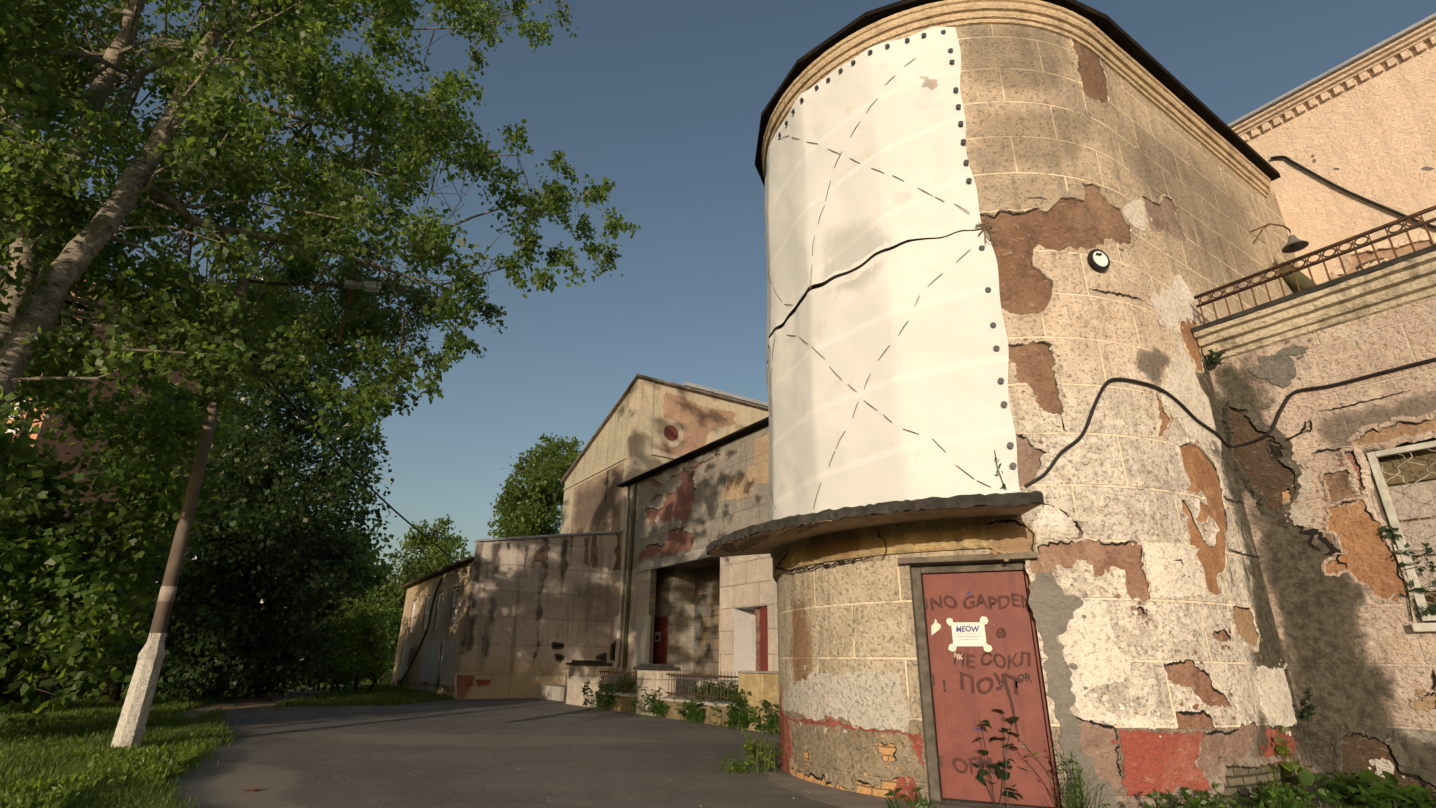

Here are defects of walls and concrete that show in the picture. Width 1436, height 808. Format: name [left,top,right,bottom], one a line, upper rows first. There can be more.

flaking render [1068,38,1110,107]
flaking render [967,180,1186,321]
water stain [462,537,573,655]
flaking render [582,533,622,571]
flaking render [638,392,736,562]
flaking render [984,270,1436,808]
water stain [1197,359,1436,803]
peeling [779,652,925,802]